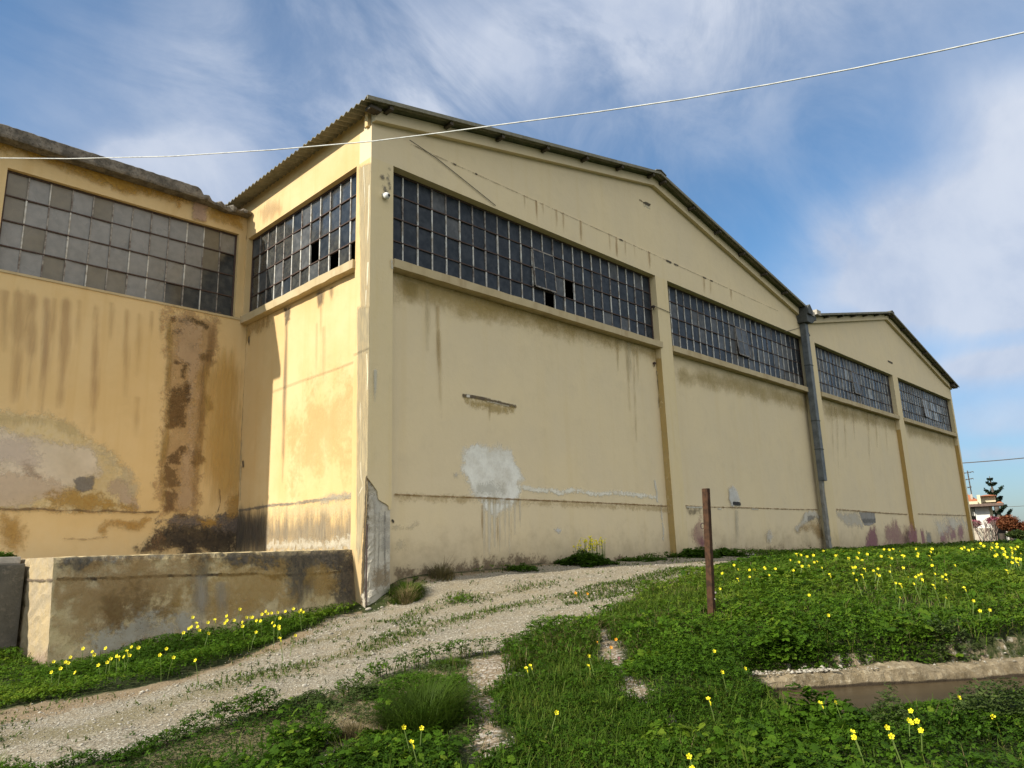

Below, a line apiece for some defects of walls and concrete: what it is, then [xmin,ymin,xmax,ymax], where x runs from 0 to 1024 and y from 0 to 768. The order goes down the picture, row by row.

peeling [0,409,139,513]
water stain [60,306,356,605]
peeling [836,511,876,528]